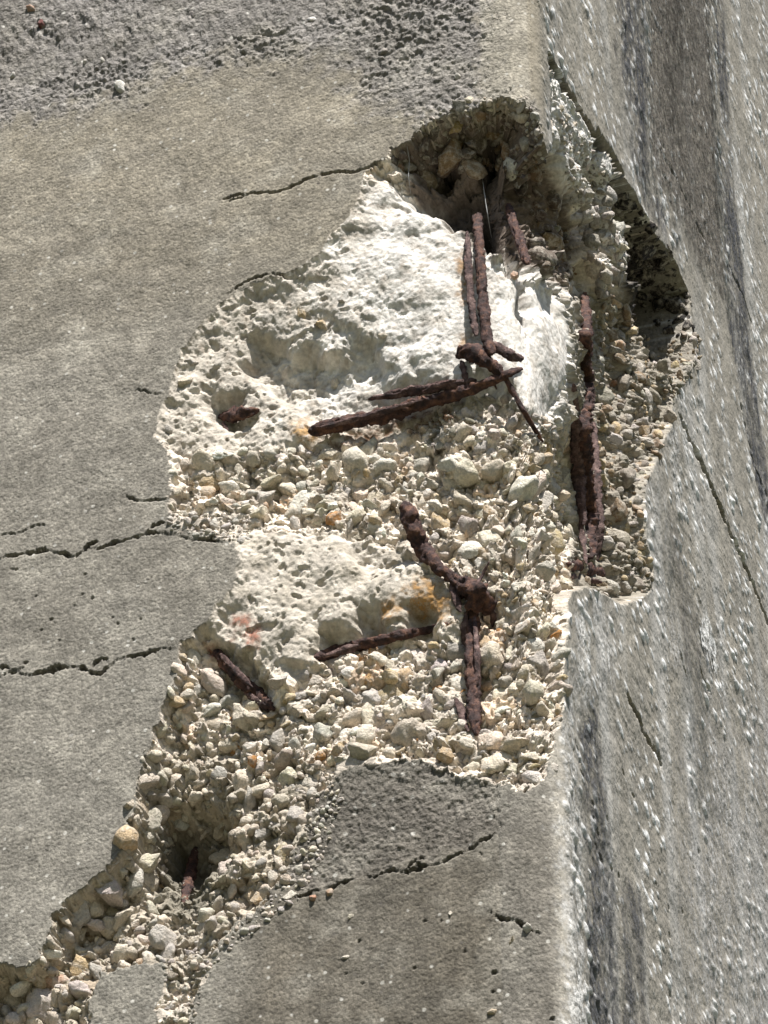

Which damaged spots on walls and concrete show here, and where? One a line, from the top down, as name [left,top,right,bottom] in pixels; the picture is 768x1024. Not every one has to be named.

crack [222,161,377,203]
corrosion [457,231,479,344]
corrosion [493,341,524,362]
corrosion [293,360,477,449]
corrosion [569,382,605,562]
crack [0,495,228,572]
spalling [151,59,716,1024]
crack [0,647,175,678]
corrosion [208,648,270,712]
corrosion [322,644,362,658]
corrosion [382,562,497,689]
crack [291,832,496,900]